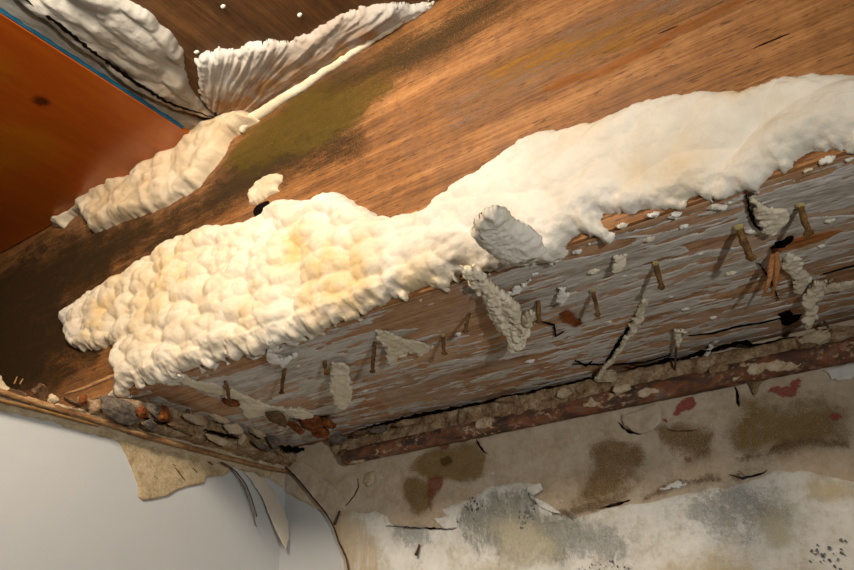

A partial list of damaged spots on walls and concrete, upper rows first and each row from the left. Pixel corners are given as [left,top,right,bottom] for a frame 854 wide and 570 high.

corrosion [559,309,583,328]
crack [357,262,795,430]
peeling [0,373,346,549]
leakage [335,505,382,570]
leakage [389,382,854,570]